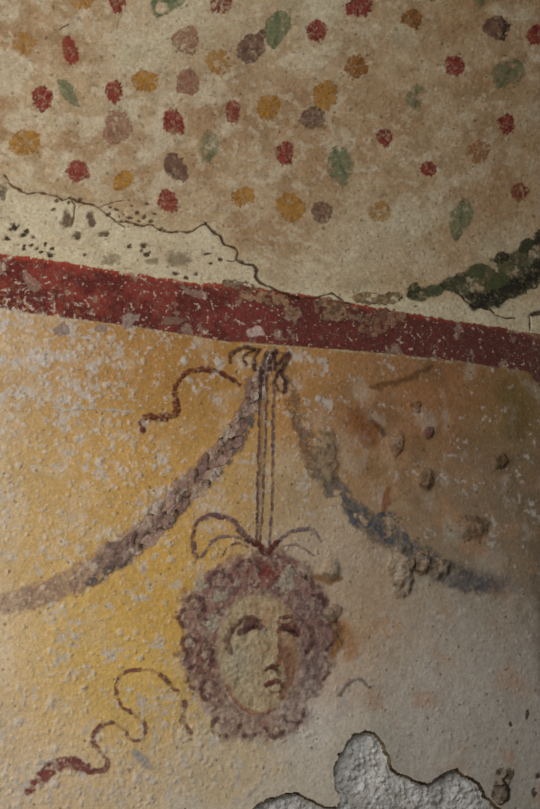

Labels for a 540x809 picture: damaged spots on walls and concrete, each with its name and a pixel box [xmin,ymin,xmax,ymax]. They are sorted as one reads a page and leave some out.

crack [4,174,352,305]
crack [459,294,540,328]
spalling [252,730,514,809]